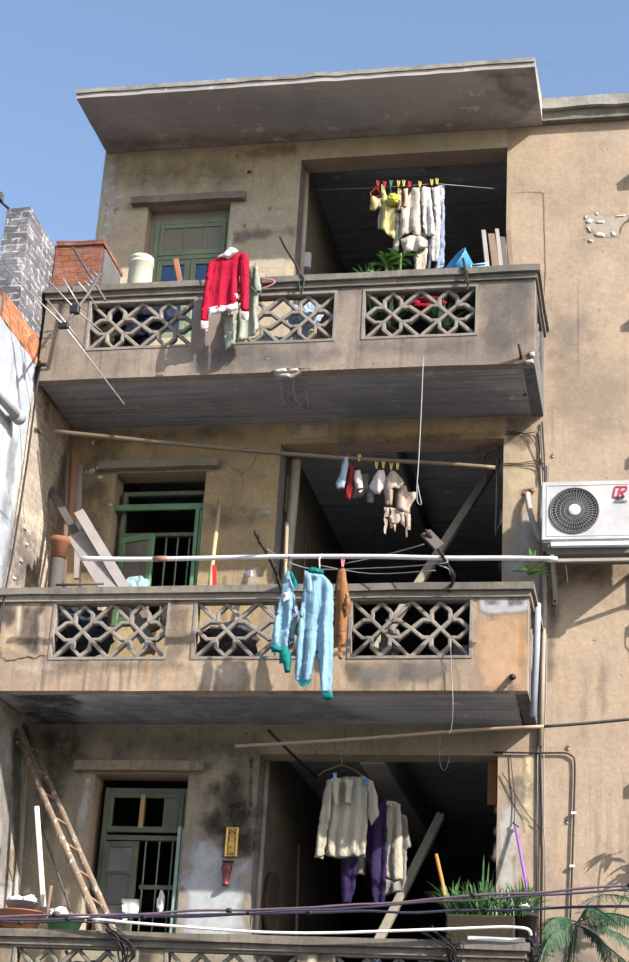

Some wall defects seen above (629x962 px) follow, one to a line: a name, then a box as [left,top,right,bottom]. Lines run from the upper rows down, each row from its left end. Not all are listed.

spalling [585,212,629,242]
water stain [9,733,21,871]